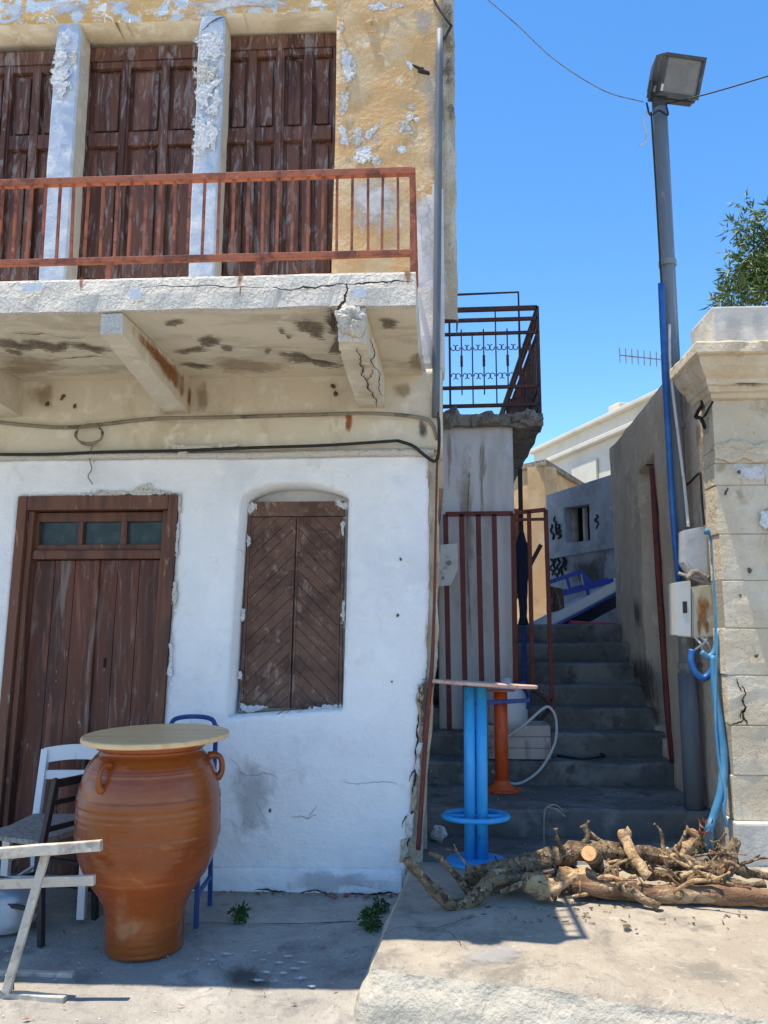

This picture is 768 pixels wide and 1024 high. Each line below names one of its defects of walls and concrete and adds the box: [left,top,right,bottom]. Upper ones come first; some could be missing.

peeling [190,0,279,13]
peeling [49,32,77,100]
peeling [191,30,225,161]
peeling [337,20,382,167]
peeling [396,103,419,154]
peeling [407,61,430,75]
crack [142,260,414,310]
corrosion [143,337,191,405]
crack [356,339,384,408]
crack [731,679,748,726]